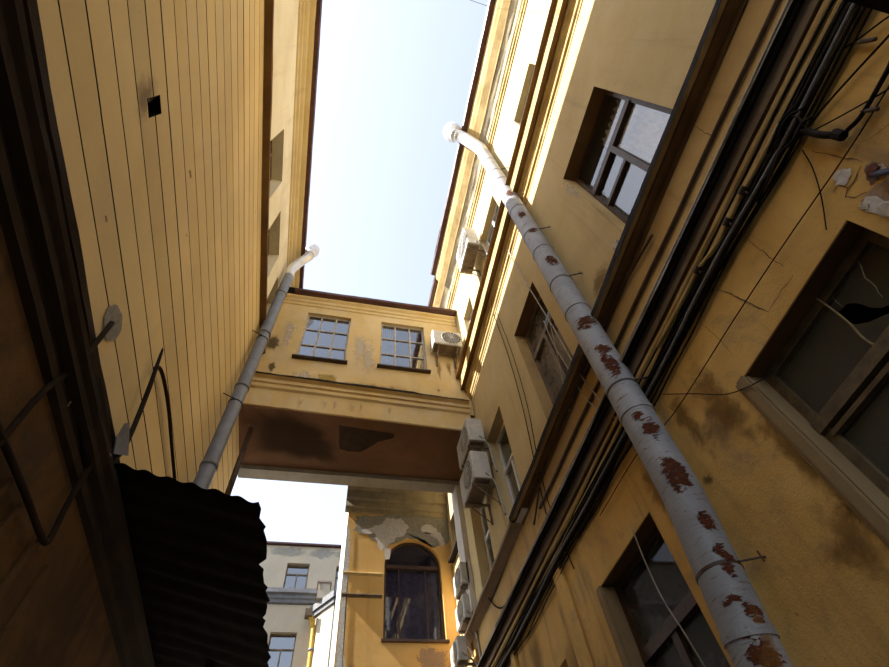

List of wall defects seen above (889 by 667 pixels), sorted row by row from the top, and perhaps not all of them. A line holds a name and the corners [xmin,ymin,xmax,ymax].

peeling [833,168,852,186]
flaking render [858,161,889,217]
crack [717,239,793,312]
rust [594,344,621,380]
damp [263,417,330,459]
rust [631,411,661,441]
rust [660,451,694,494]
rust [696,510,718,531]
rust [712,543,738,577]
flaking render [335,515,450,667]
rust [722,594,766,623]
rust [738,634,786,667]